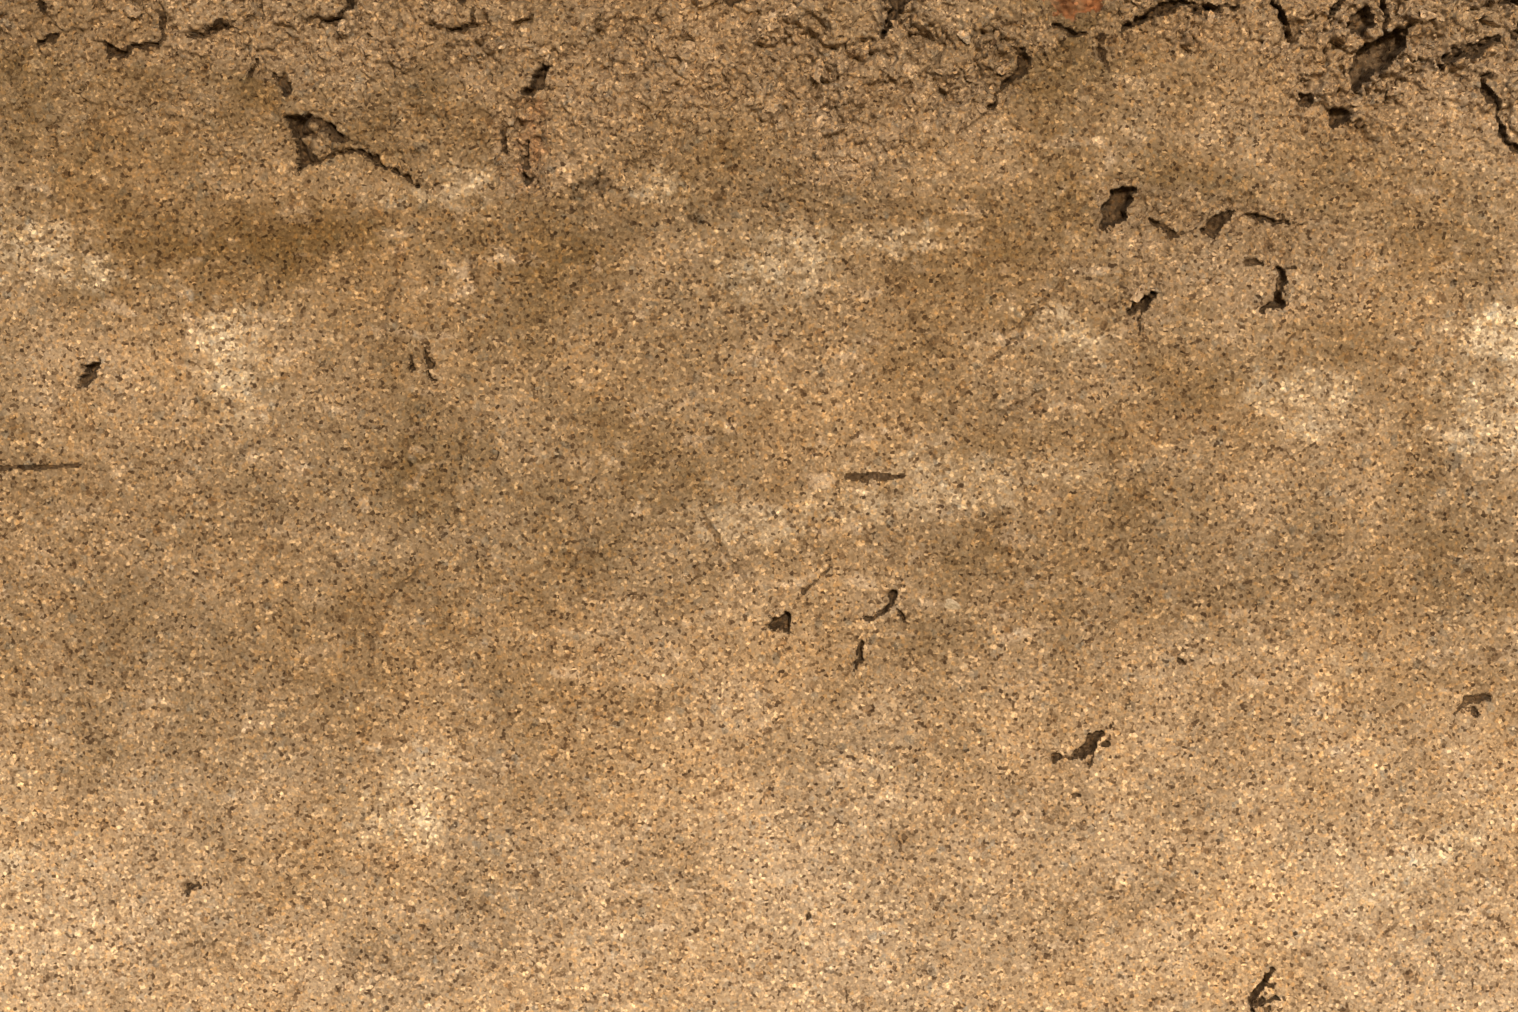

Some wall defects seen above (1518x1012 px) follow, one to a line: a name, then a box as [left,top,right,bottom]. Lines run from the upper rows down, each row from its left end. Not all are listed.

spalling [0,0,1518,201]
crack [987,0,1291,110]
crack [1327,0,1392,35]
crack [1436,41,1518,155]